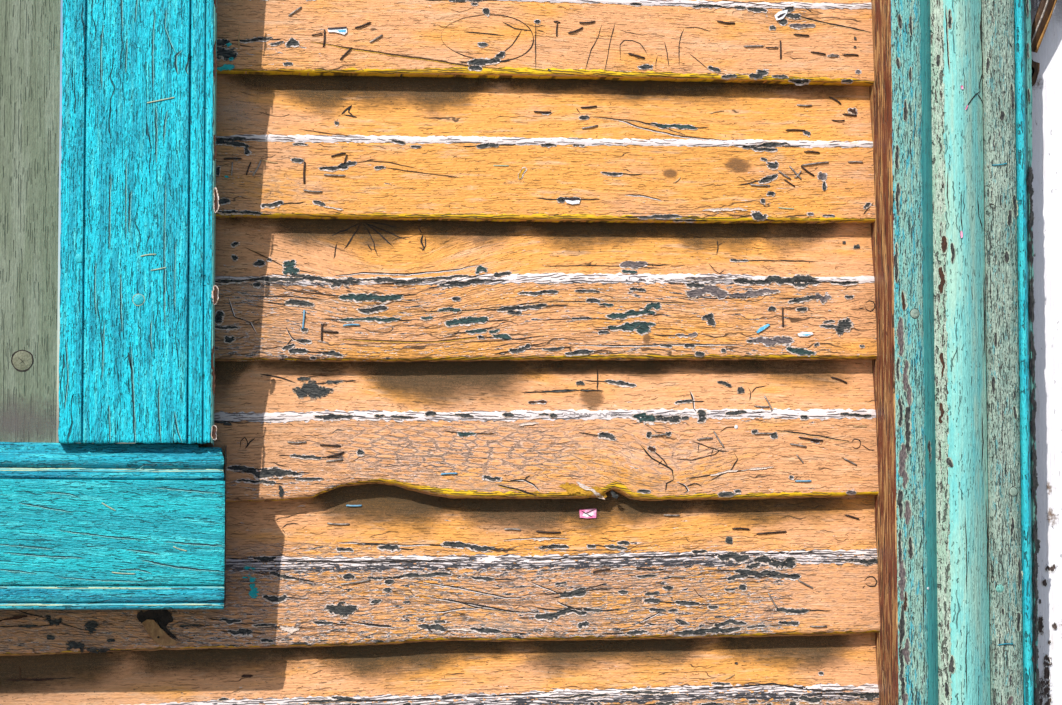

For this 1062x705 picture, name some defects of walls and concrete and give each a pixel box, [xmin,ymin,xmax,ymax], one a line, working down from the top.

damp [726,158,750,171]
peeling [738,141,801,185]
peeling [670,274,859,313]
peeling [211,259,512,395]
peeling [430,289,608,357]
peeling [596,287,716,348]
peeling [631,399,709,426]
peeling [1007,167,1057,705]
peeling [227,453,343,497]
peeling [691,536,801,581]
peeling [520,583,617,630]
peeling [643,597,747,637]